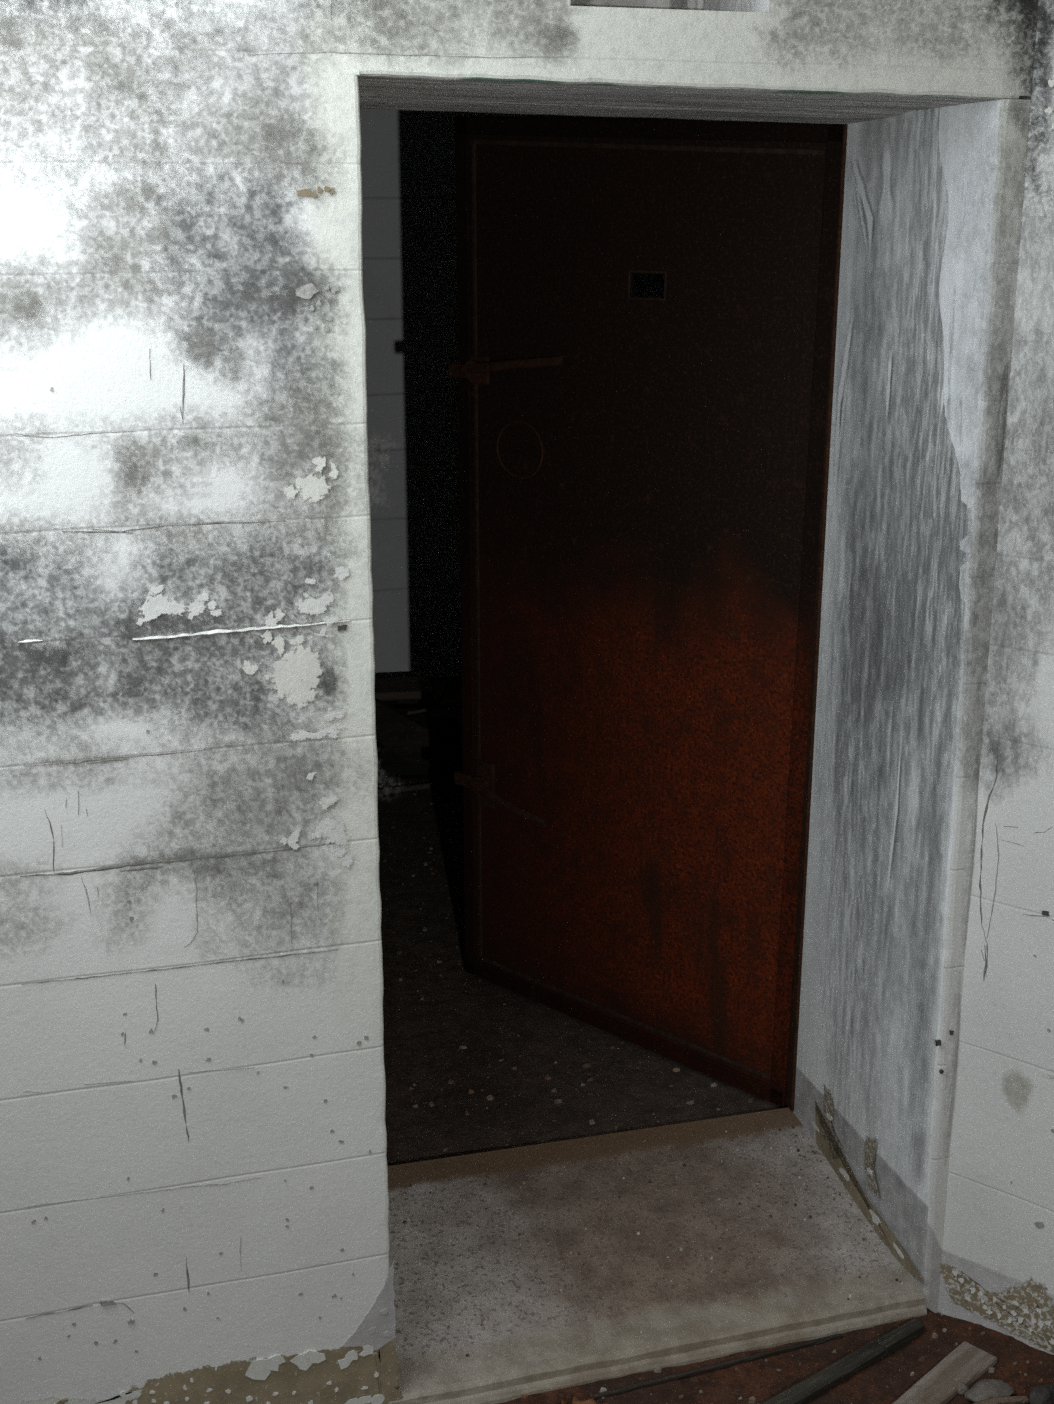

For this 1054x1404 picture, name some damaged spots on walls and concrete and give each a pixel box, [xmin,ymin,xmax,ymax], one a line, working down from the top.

leakage [987,0,1054,190]
leakage [0,0,346,928]
leakage [835,109,1054,1101]
peeling [811,1084,924,1283]
peeling [21,1261,403,1404]
peeling [940,1263,1054,1353]